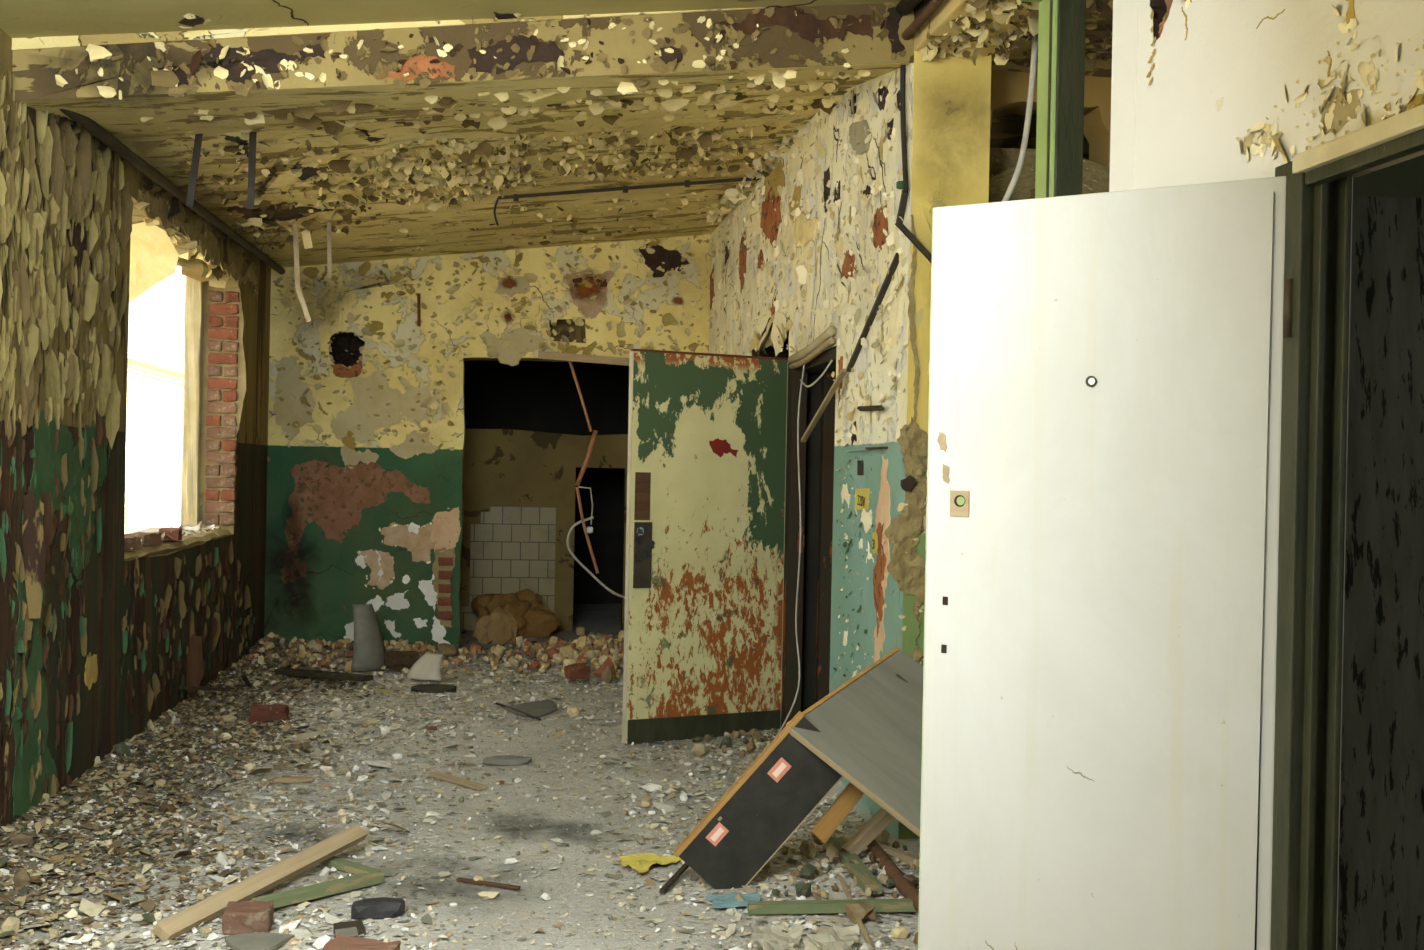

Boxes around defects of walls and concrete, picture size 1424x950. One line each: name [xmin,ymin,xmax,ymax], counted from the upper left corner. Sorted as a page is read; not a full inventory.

spalling [1146,0,1192,85]
crack [1256,9,1285,29]
peeling [1236,0,1424,163]
spalling [1082,158,1110,194]